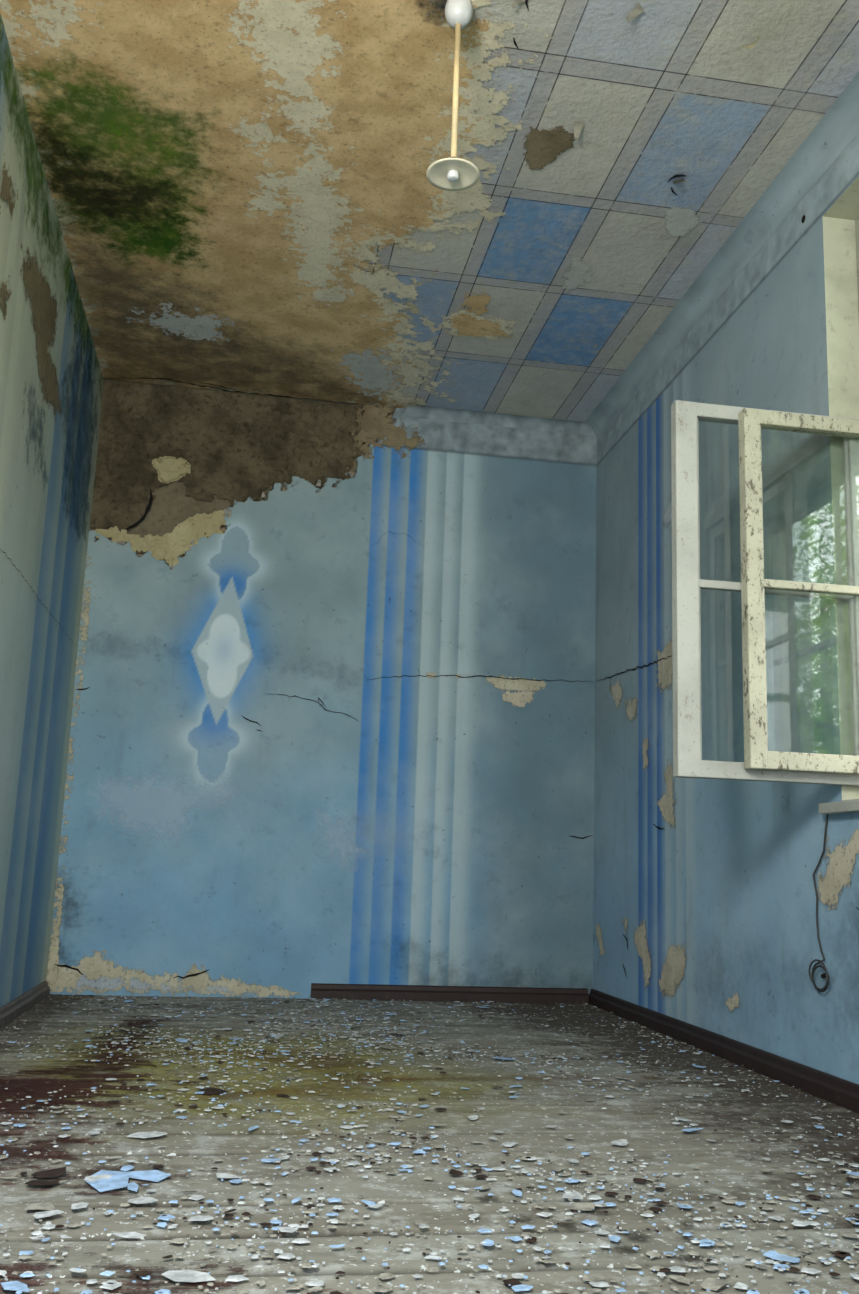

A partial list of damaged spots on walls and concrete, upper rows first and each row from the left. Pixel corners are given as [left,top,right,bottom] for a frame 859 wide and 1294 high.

damp [0,19,349,536]
peeling [0,0,585,570]
peeling [486,674,546,708]
crack [370,655,672,684]
spalling [46,554,301,998]
peeling [817,828,859,910]
peeling [622,917,687,999]